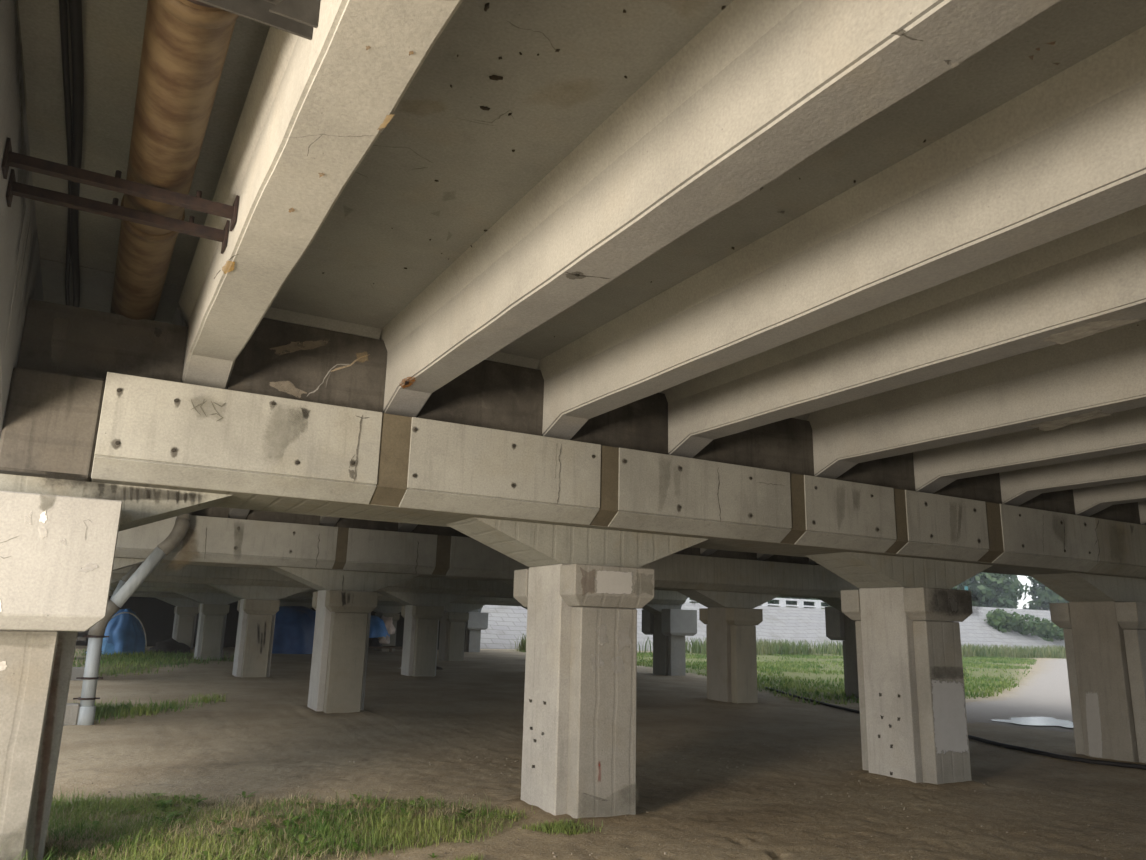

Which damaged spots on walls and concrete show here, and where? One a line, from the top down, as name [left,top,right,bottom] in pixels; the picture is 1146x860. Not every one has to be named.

corrosion [214,254,239,279]
corrosion [399,377,416,389]
crack [349,415,370,481]